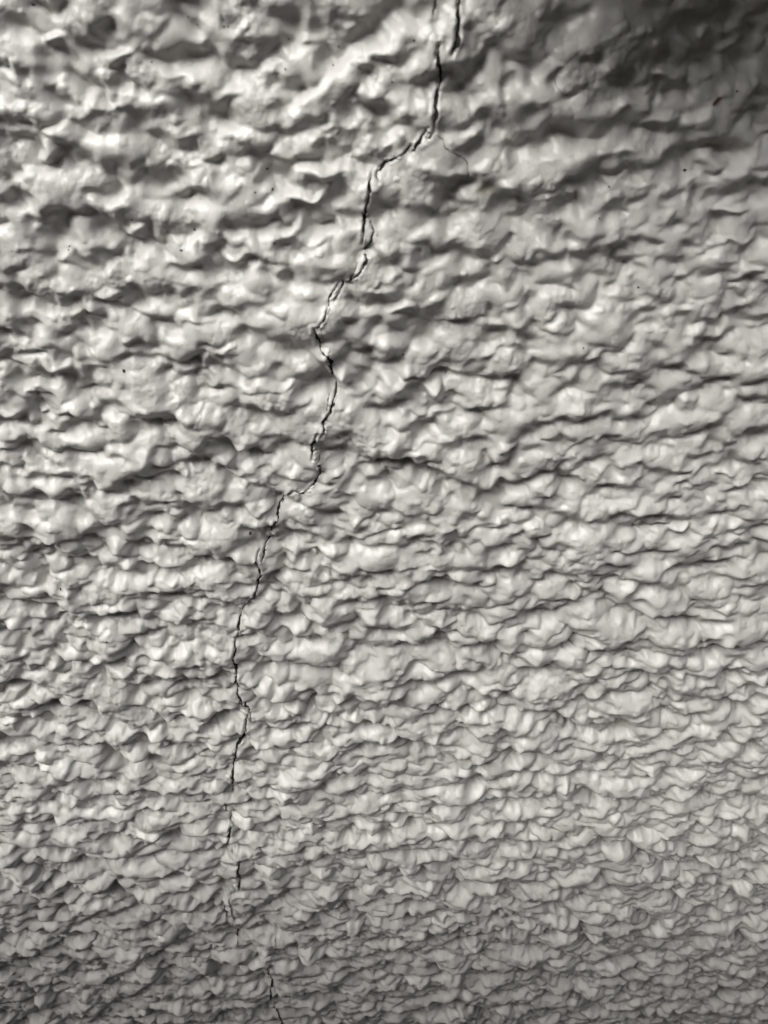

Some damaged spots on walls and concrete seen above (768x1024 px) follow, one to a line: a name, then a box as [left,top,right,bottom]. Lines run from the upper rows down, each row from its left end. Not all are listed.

crack [223,0,469,947]
crack [267,933,283,1024]